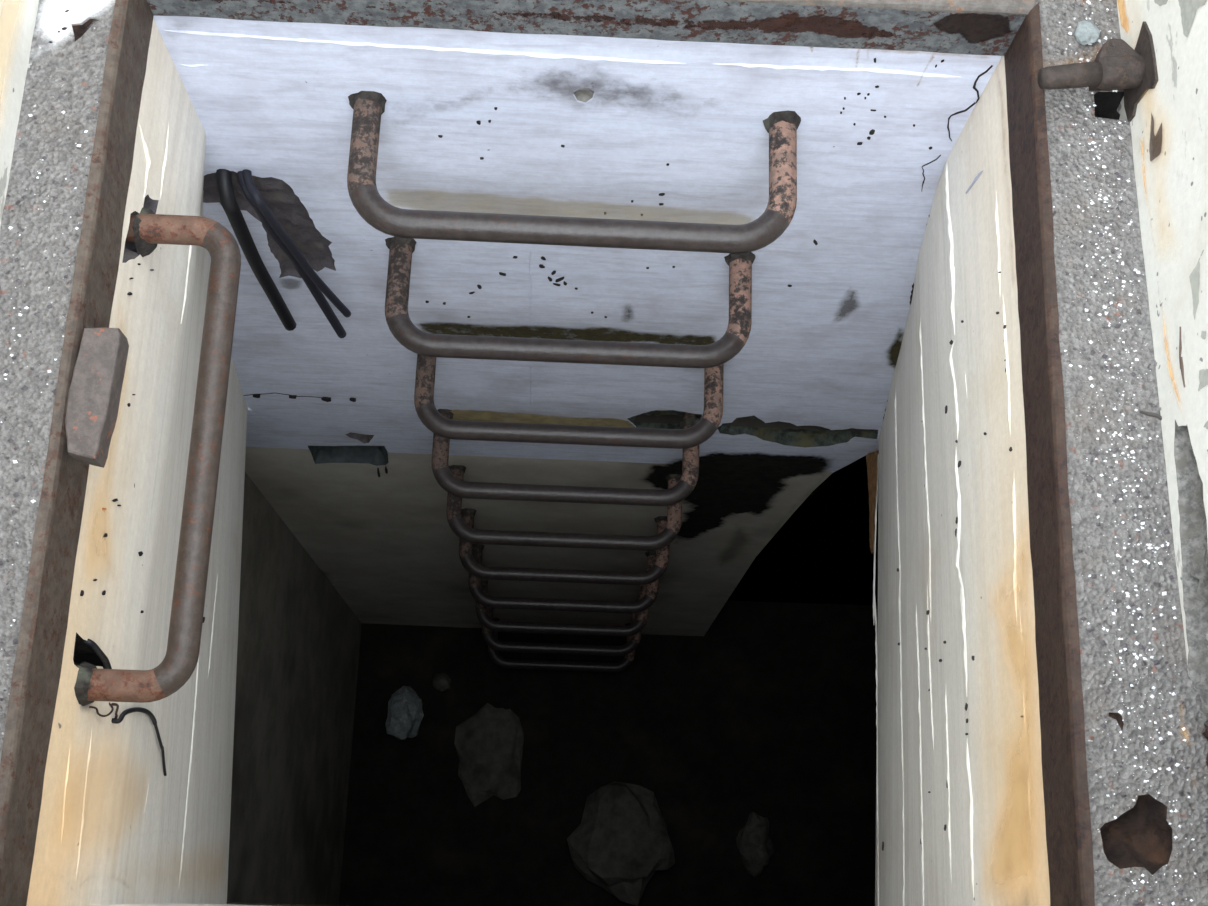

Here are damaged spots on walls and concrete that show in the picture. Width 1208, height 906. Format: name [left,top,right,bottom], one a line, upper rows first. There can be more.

rust [492,0,893,40]
peeling [1154,0,1207,37]
peeling [1189,250,1206,339]
peeling [1198,369,1208,391]
spalling [627,410,702,429]
spalling [718,415,878,448]
spalling [1100,794,1172,875]